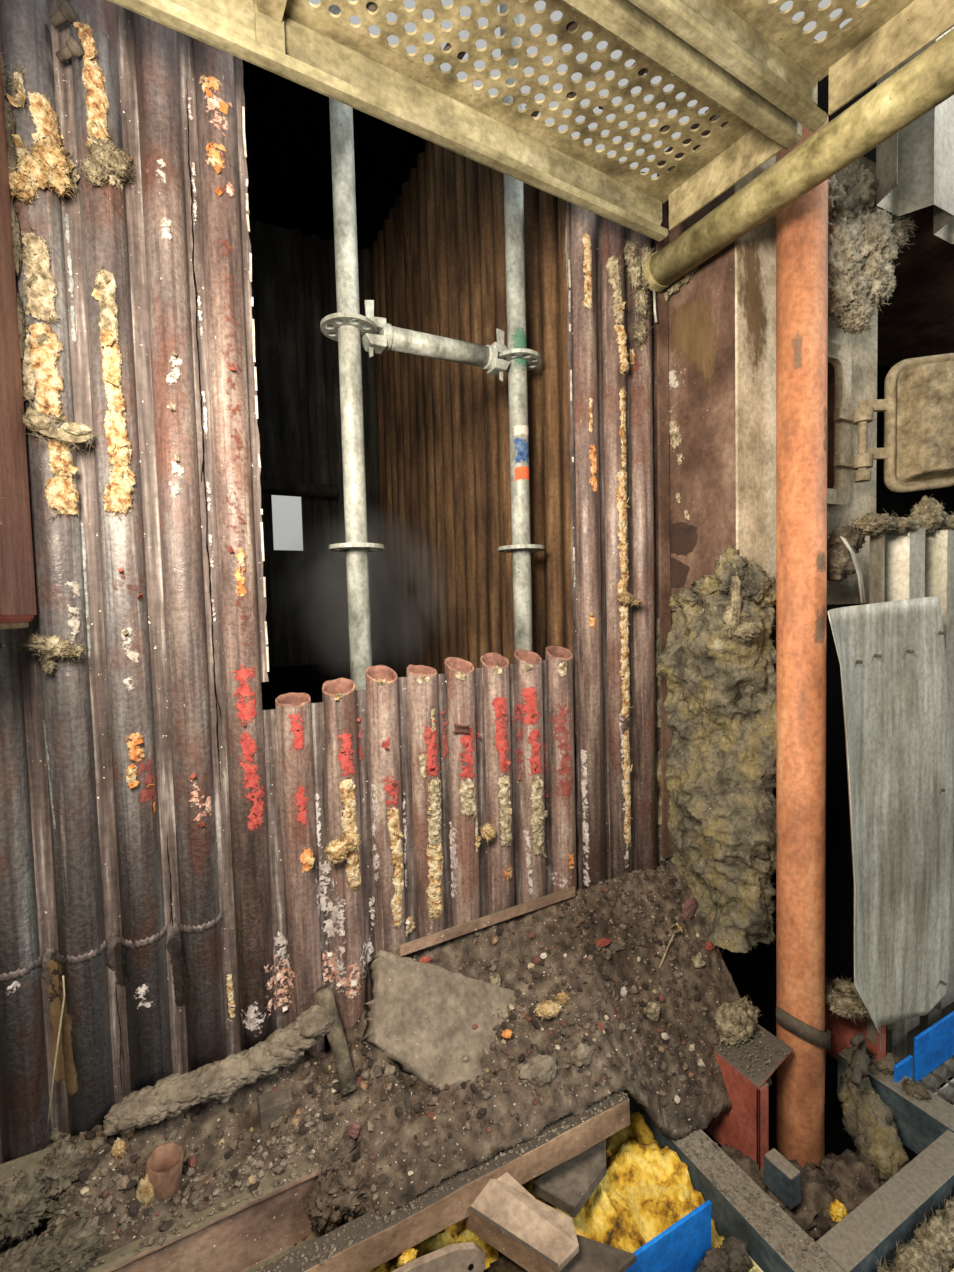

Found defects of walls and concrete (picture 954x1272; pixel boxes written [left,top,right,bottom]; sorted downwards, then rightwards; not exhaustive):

corrosion [199,76,236,196]
corrosion [582,233,592,309]
corrosion [589,398,598,492]
corrosion [453,723,470,734]
corrosion [125,732,157,813]